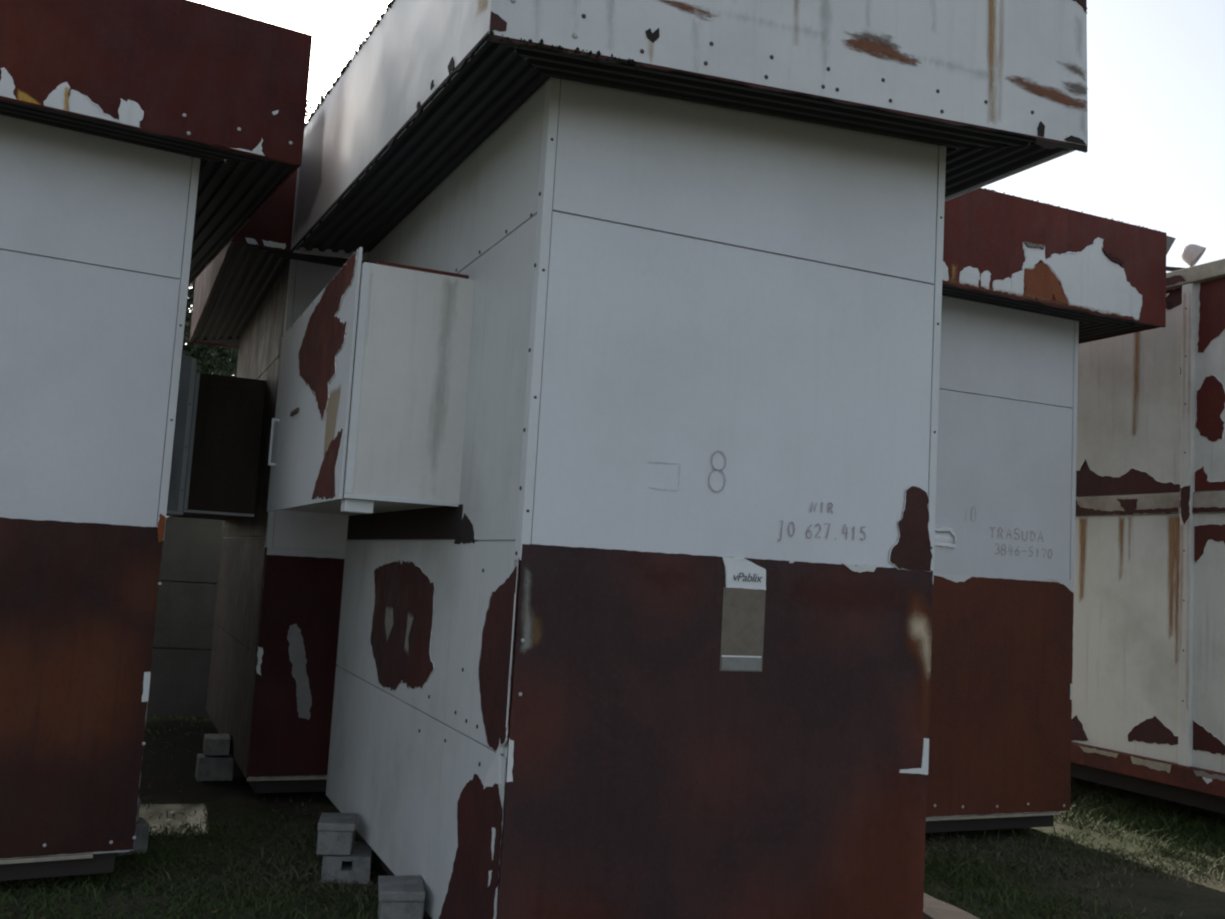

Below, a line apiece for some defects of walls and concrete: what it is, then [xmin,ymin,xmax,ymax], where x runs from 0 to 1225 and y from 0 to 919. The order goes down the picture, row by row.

peeling [0,67,144,128]
corrosion [290,0,1088,253]
peeling [942,237,1143,320]
corrosion [1075,459,1225,645]